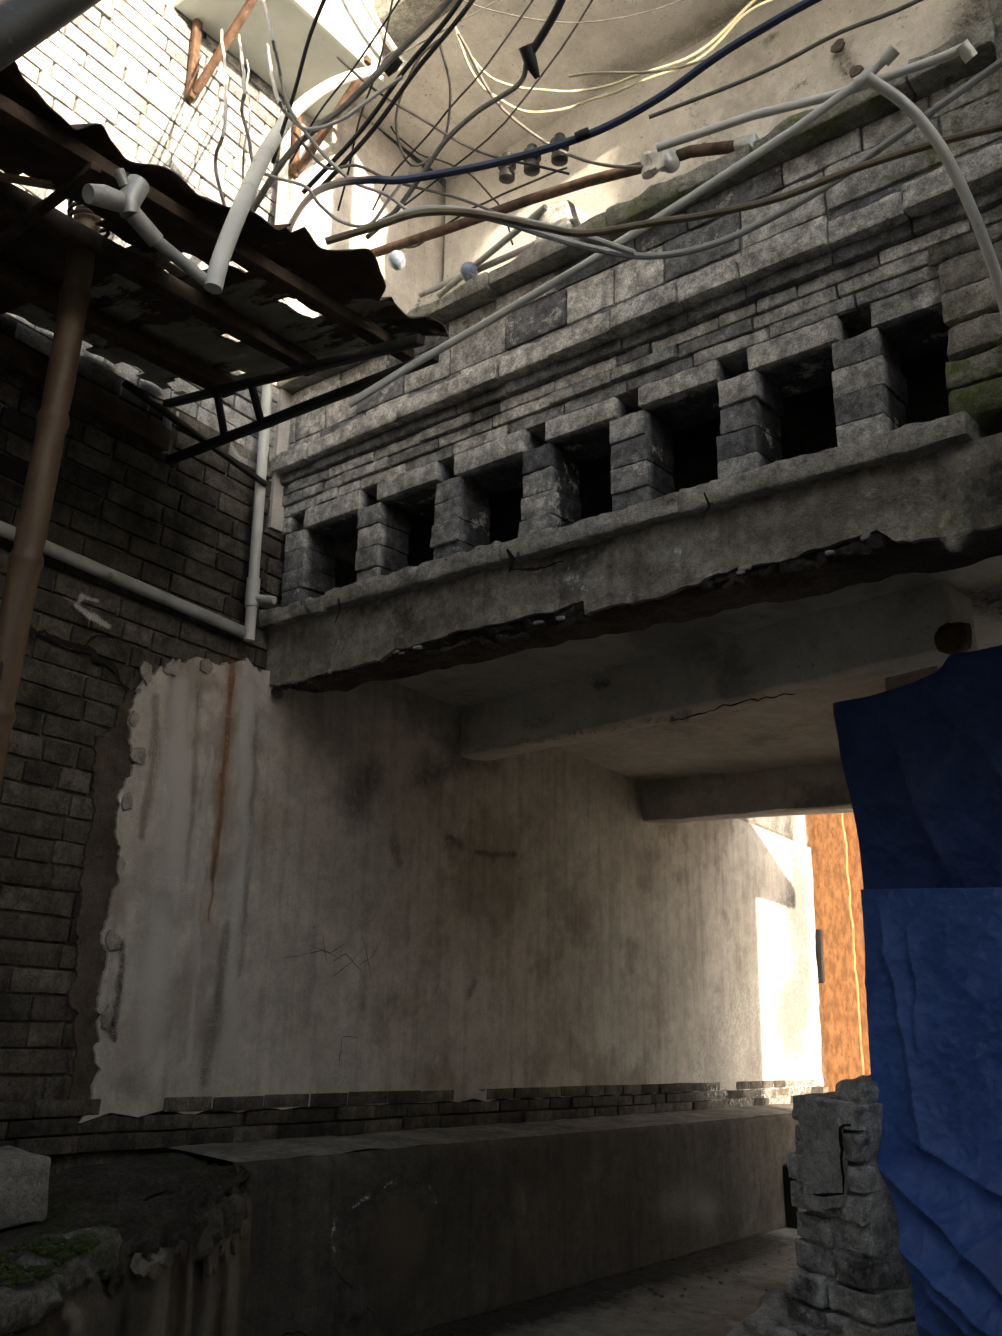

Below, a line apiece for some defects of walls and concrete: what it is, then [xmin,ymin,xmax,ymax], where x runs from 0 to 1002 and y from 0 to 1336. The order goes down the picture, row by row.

spalling [698,533,888,592]
spalling [392,604,597,660]
flaking render [139,658,178,686]
crack [669,693,795,723]
corrosion [208,663,234,920]
spalling [130,1214,197,1280]